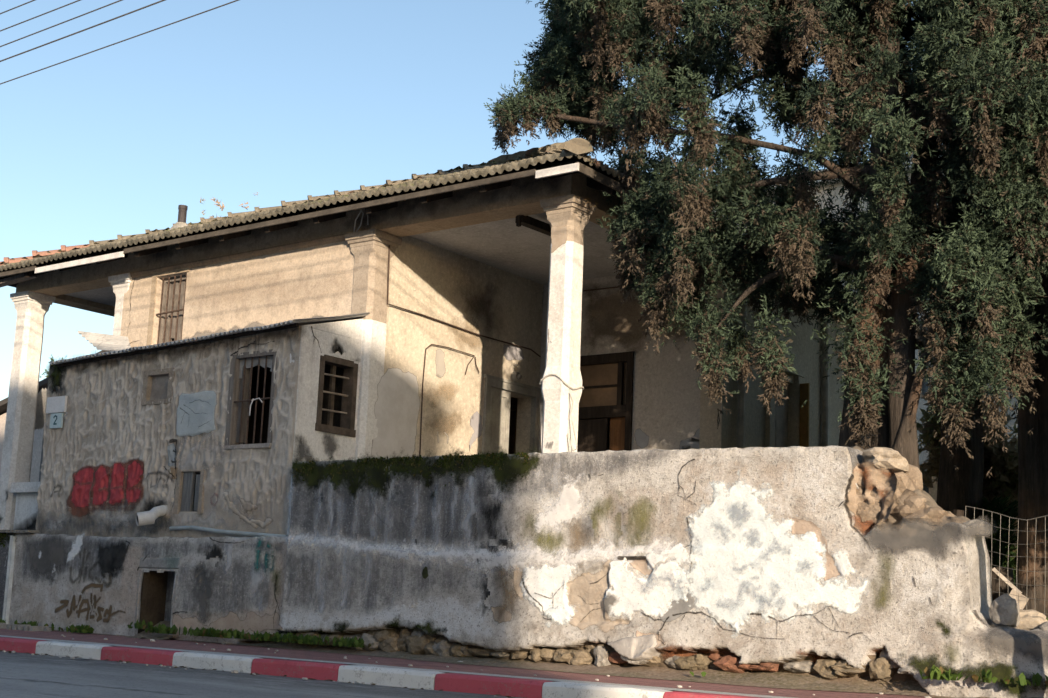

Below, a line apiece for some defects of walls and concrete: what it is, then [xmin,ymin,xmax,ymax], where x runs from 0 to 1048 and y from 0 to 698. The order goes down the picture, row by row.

water stain [323,434,337,453]
peeling [679,428,700,450]
water stain [15,499,238,584]
water stain [194,546,232,622]
water stain [287,437,676,617]
crack [678,459,696,571]
peeling [513,470,869,648]
crack [641,606,871,645]
spalling [845,447,956,533]